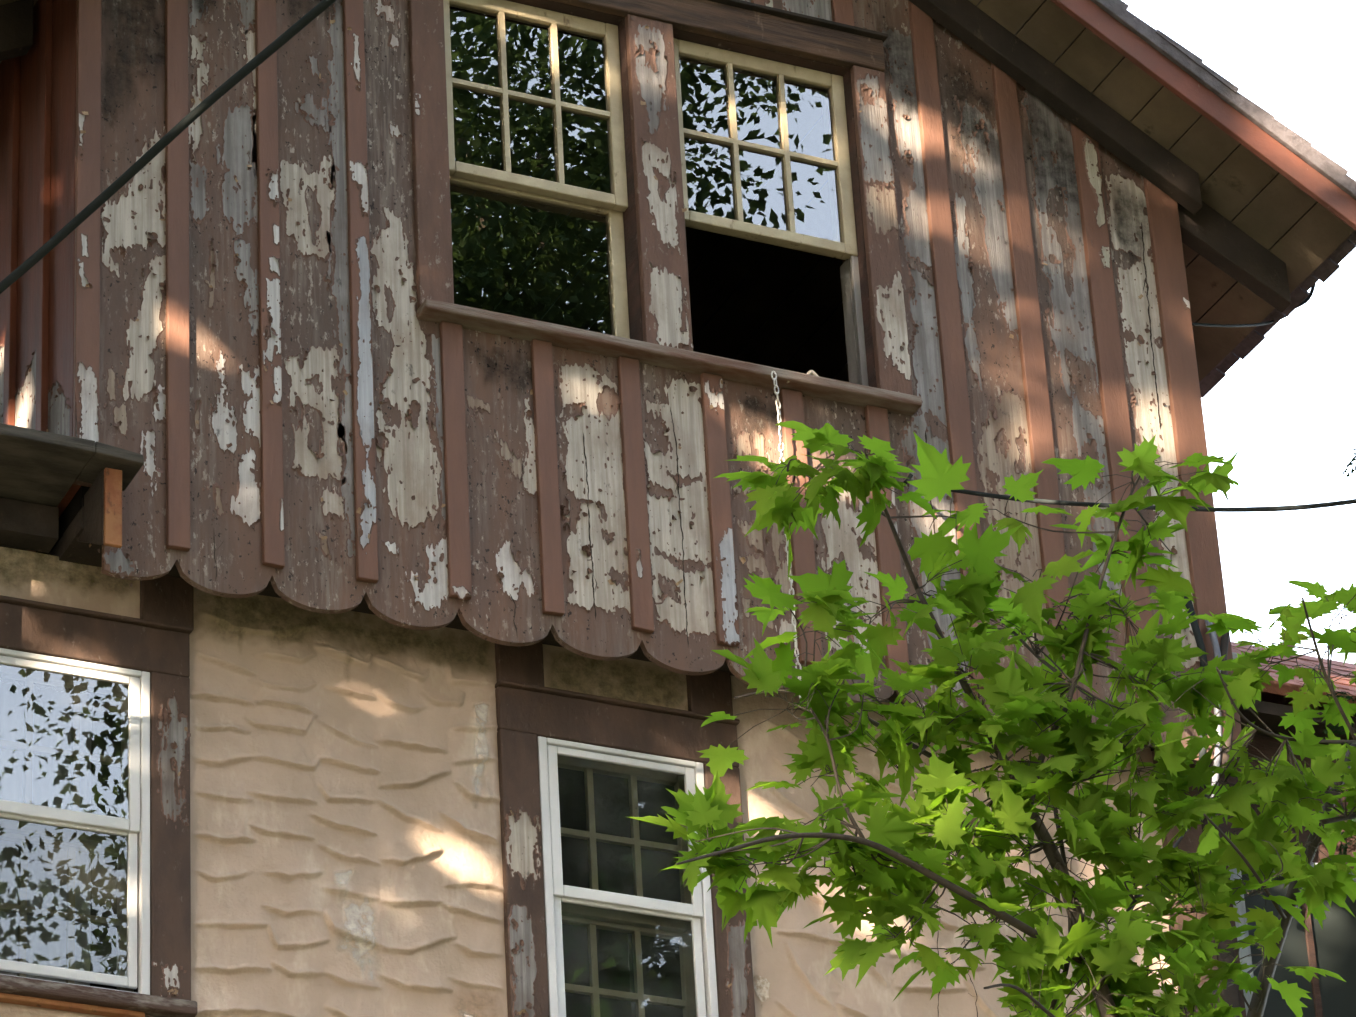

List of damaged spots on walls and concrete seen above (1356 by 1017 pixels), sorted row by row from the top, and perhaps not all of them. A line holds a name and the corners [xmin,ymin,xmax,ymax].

peeling [743,0,832,21]
peeling [0,125,166,497]
peeling [155,689,191,829]
peeling [188,0,472,612]
peeling [504,803,542,1017]
peeling [630,16,694,350]
peeling [556,359,797,648]
peeling [815,478,885,660]
peeling [855,28,961,662]
peeling [931,661,978,700]
peeling [952,95,1047,649]
peeling [1020,85,1200,670]